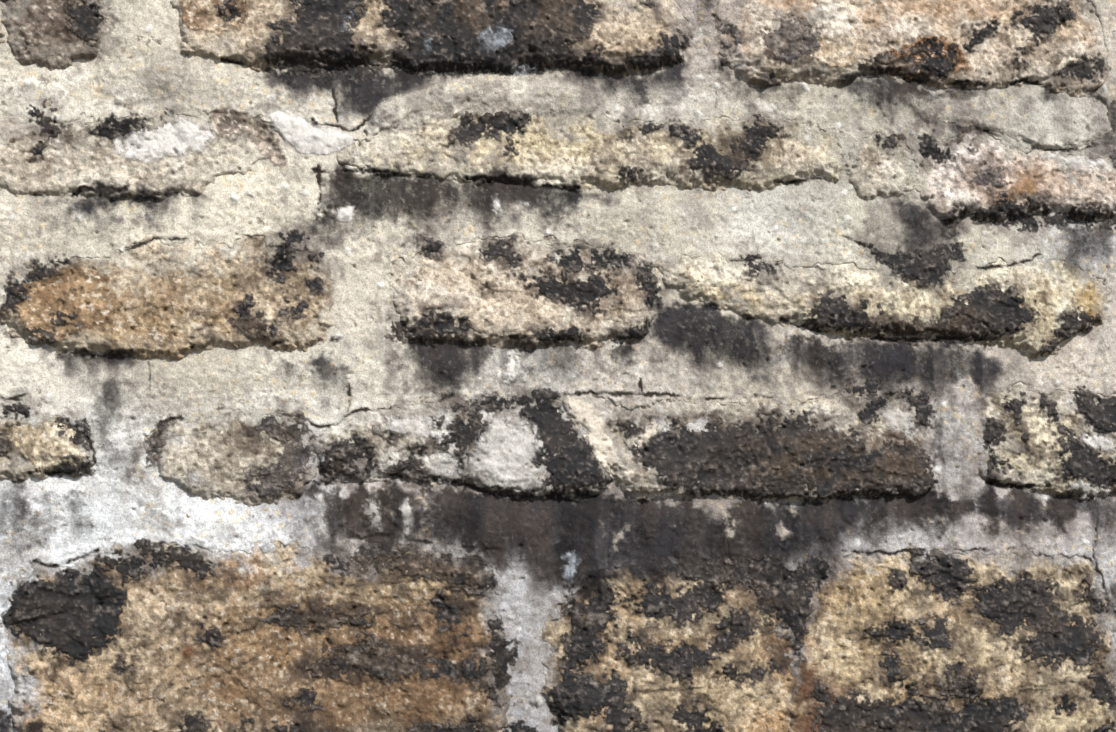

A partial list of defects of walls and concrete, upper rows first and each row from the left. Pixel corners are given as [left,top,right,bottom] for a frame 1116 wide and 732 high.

water stain [483,27,510,47]
water stain [272,63,440,119]
water stain [611,343,632,363]
water stain [652,301,1001,392]
water stain [297,395,1116,597]